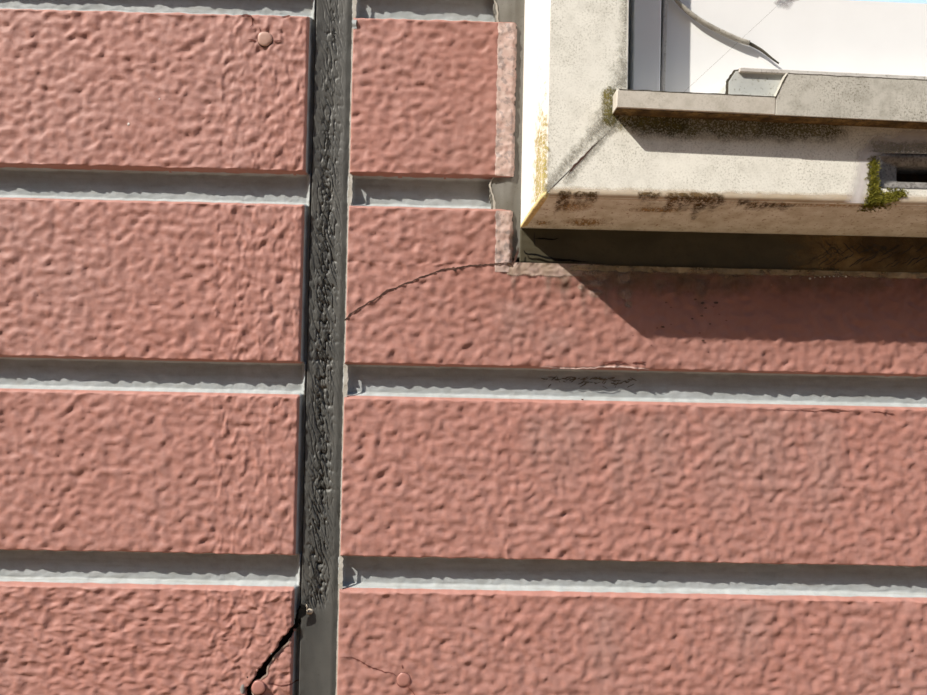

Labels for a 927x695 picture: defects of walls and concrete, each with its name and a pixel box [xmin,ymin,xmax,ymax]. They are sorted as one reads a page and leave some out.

damp [596,62,845,141]
damp [556,191,597,207]
damp [638,192,723,213]
damp [853,133,927,203]
crack [240,0,586,695]